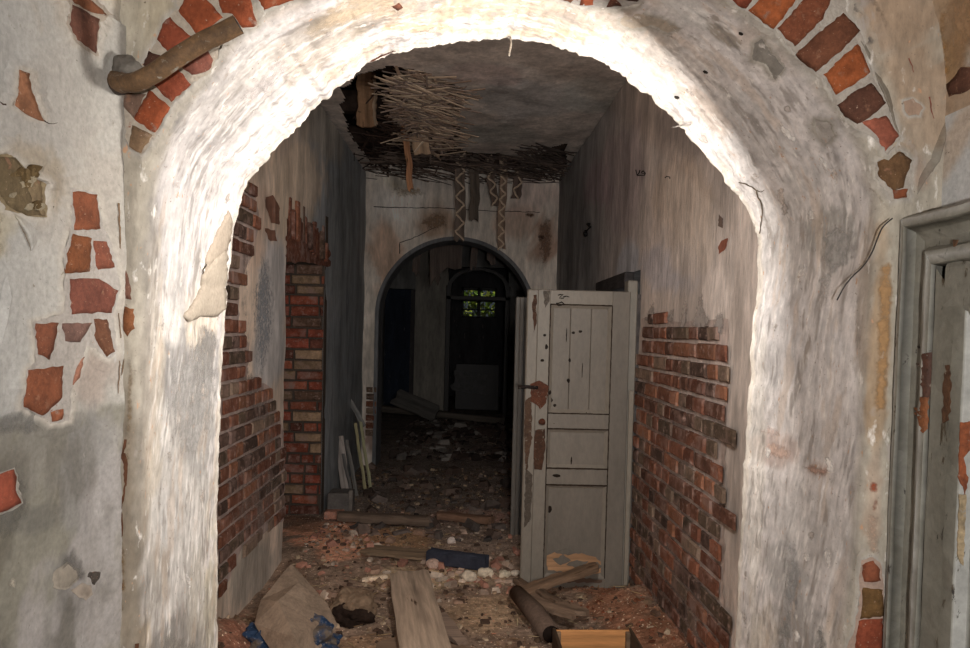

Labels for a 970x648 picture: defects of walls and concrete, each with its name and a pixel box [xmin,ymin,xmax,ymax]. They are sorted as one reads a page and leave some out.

spalling [0,59,58,130]
spalling [40,0,121,70]
spalling [122,0,326,171]
peeling [540,0,691,44]
spalling [708,0,946,216]
spalling [946,67,970,97]
spalling [0,134,135,438]
spalling [183,182,331,601]
spalling [0,467,23,515]
spalling [629,298,736,648]
leakage [67,553,84,579]
spalling [831,548,887,648]